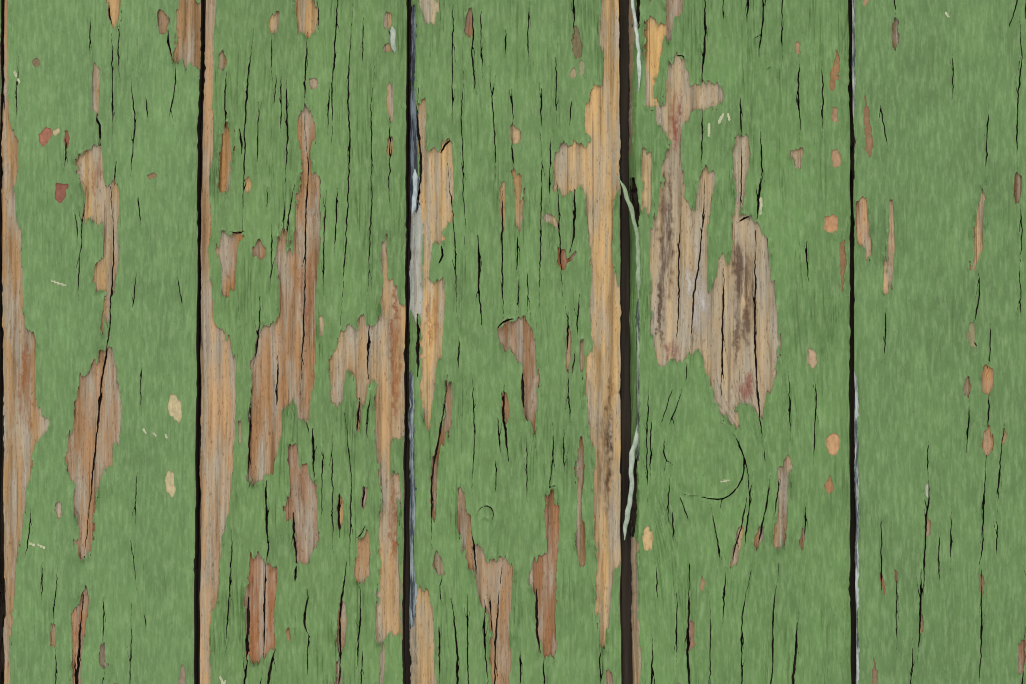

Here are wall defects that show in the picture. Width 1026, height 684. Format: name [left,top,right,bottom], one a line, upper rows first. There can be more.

peeling [92,62,100,118]
peeling [106,0,122,29]
peeling [0,0,52,684]
peeling [39,127,124,567]
peeling [157,0,458,684]
peeling [452,0,781,684]
peeling [66,581,109,684]